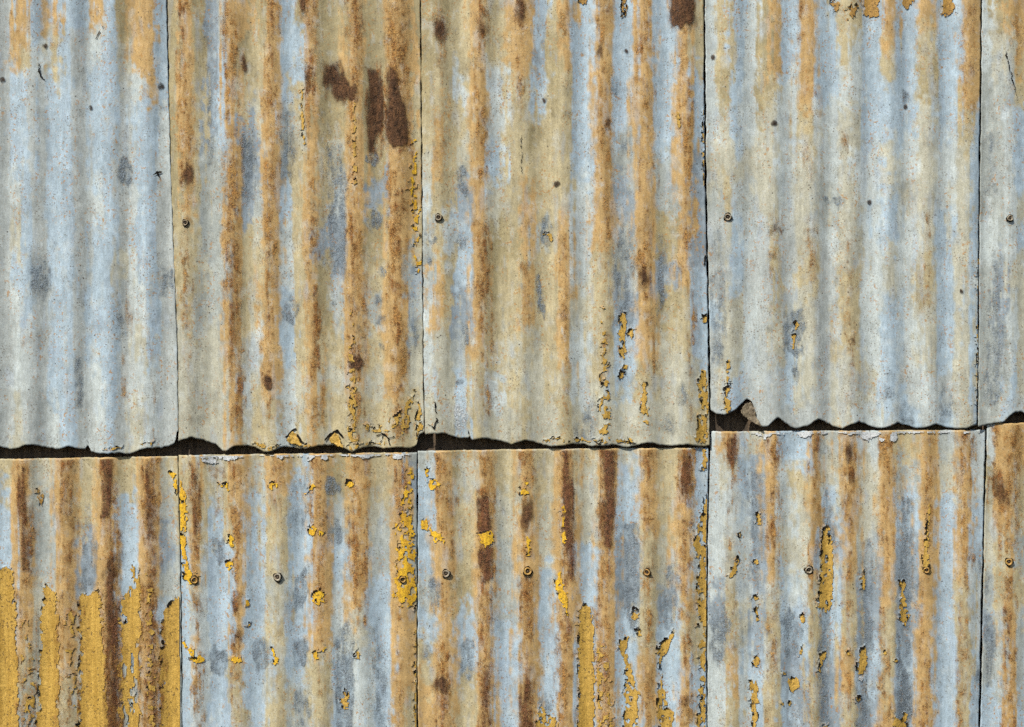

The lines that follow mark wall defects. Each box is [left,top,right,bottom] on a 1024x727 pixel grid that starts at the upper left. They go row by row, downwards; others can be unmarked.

rust [305,0,413,157]
rust [669,0,697,29]
rust [344,199,367,438]
rust [386,170,410,440]
peeling [542,305,636,443]
peeling [0,563,205,727]
peeling [251,307,445,613]
rust [477,455,496,600]
peeling [553,571,642,727]
rust [594,450,617,638]
peeling [653,627,674,727]
peeling [797,524,833,622]